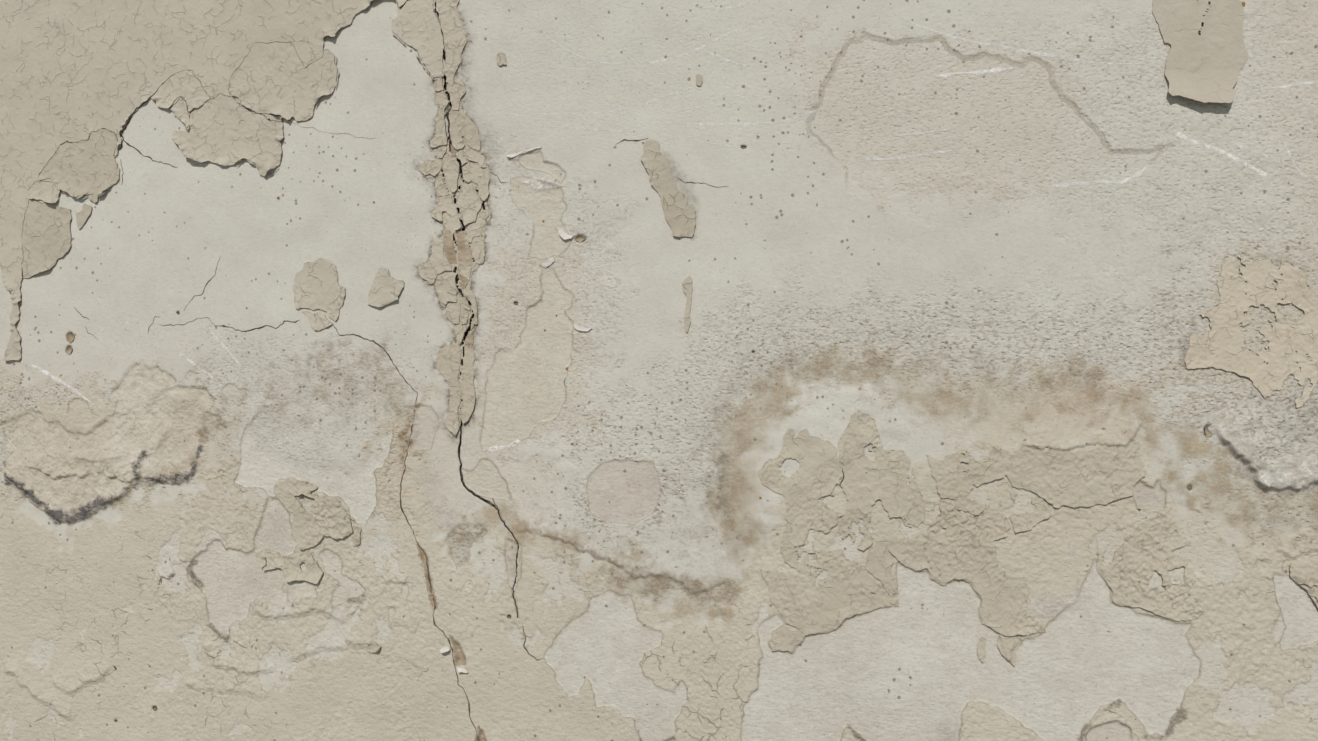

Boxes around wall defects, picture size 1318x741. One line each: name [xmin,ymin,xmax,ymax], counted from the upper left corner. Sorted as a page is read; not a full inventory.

peeling [1152,0,1249,103]
peeling [0,0,374,361]
peeling [367,267,404,307]
crack [400,0,543,661]
peeling [391,0,733,594]
flaking render [2,361,220,525]
crack [333,324,487,741]
peeling [544,591,688,741]
peeling [741,560,1200,741]
peeling [1274,563,1318,650]